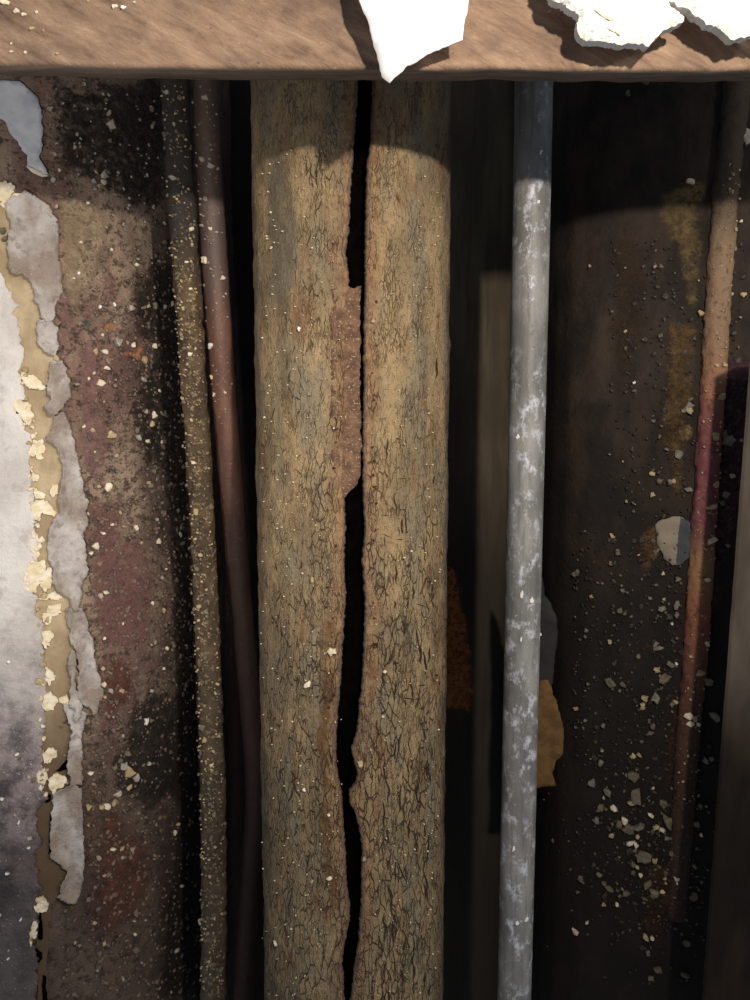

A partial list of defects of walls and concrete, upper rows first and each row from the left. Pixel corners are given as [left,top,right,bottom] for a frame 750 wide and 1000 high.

peeling [0,80,159,196]
peeling [0,181,202,1000]
crack [275,80,435,1000]
spalling [547,0,750,52]